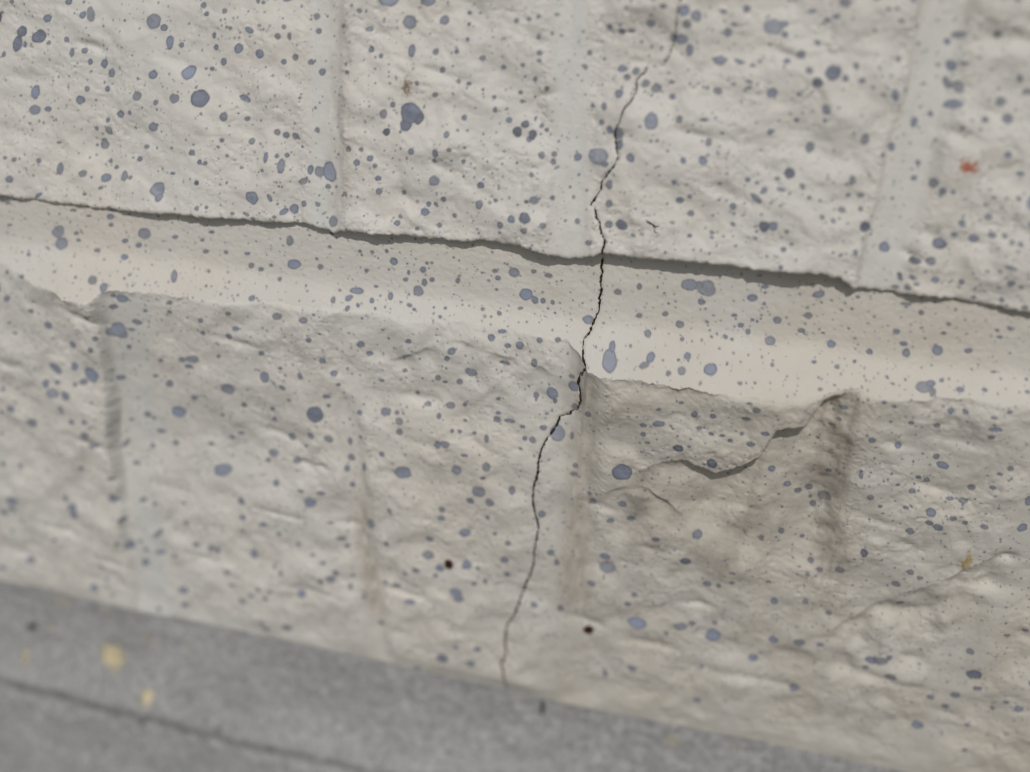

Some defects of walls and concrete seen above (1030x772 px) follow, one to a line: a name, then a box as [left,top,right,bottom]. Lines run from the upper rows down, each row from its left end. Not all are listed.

crack [500,0,681,690]
spalling [632,388,857,568]